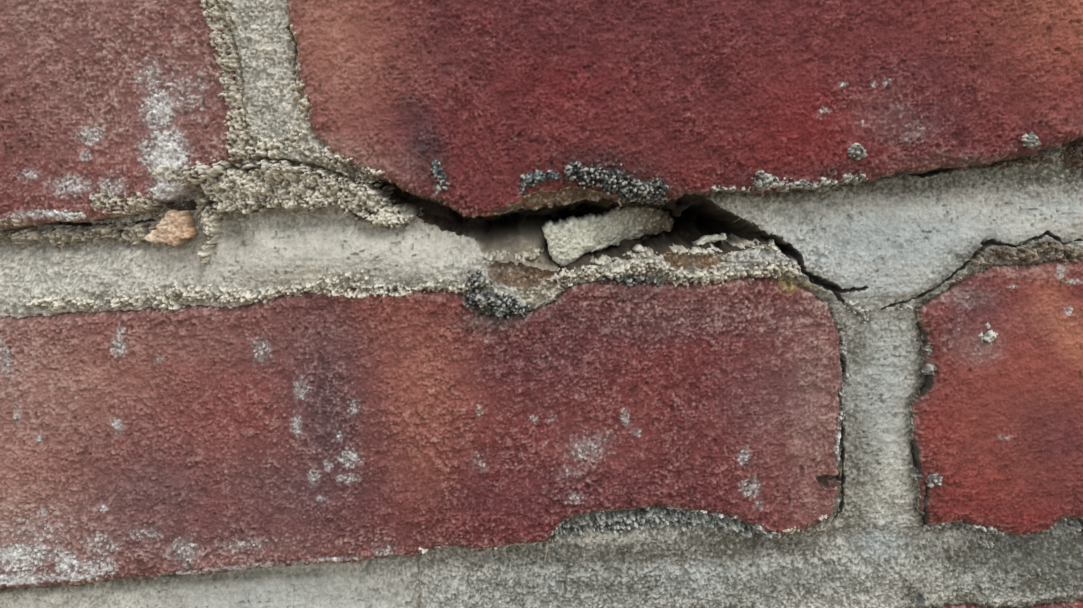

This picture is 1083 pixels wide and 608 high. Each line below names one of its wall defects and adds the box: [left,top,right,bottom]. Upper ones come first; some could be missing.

crack [228,28,248,126]
crack [285,25,299,81]
peeling [710,185,756,195]
crack [249,156,1083,397]
peeling [590,233,815,289]
crack [830,419,846,524]
crack [911,439,930,525]